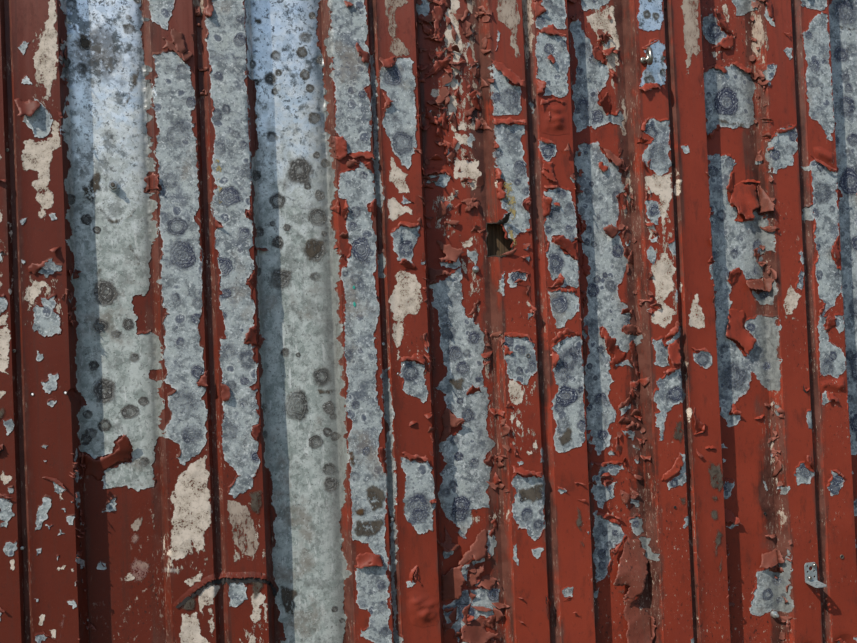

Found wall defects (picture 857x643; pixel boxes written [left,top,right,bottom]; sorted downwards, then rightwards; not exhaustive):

peeling [636,0,667,91]
peeling [0,210,28,263]
peeling [680,0,857,456]
peeling [0,274,13,375]
peeling [14,0,627,643]
peeling [2,418,15,436]
peeling [537,116,815,643]